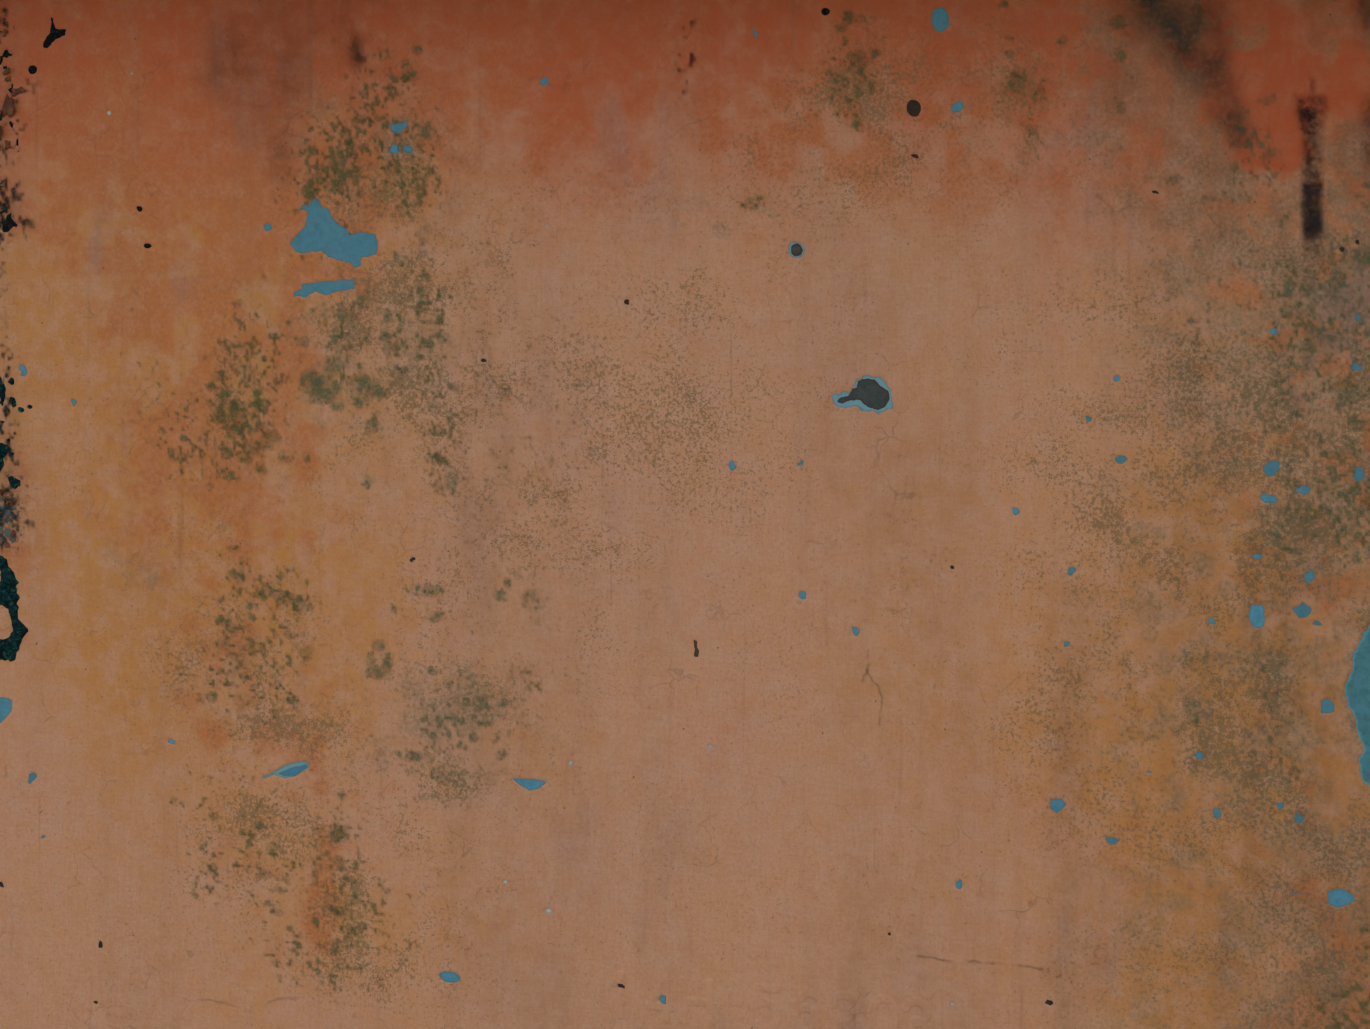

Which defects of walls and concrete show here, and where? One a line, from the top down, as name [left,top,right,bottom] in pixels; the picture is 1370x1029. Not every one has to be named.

corrosion [1299,100,1322,237]
peeling [290,198,378,297]
peeling [0,353,33,550]
spalling [832,375,893,415]
peeling [1321,624,1370,786]
peeling [1327,889,1355,907]